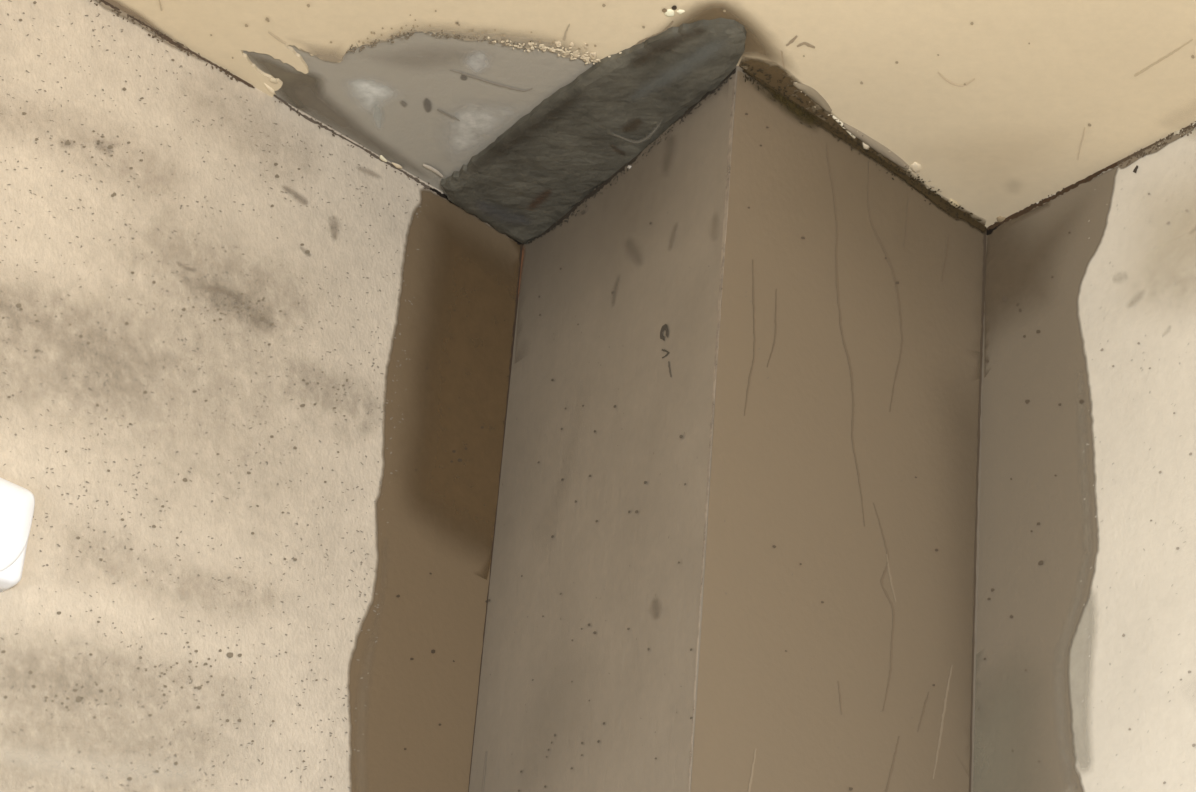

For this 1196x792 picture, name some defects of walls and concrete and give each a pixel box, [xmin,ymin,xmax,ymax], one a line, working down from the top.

damp [357,30,591,80]
spalling [232,10,596,194]
damp [450,107,512,150]
spalling [137,641,242,696]